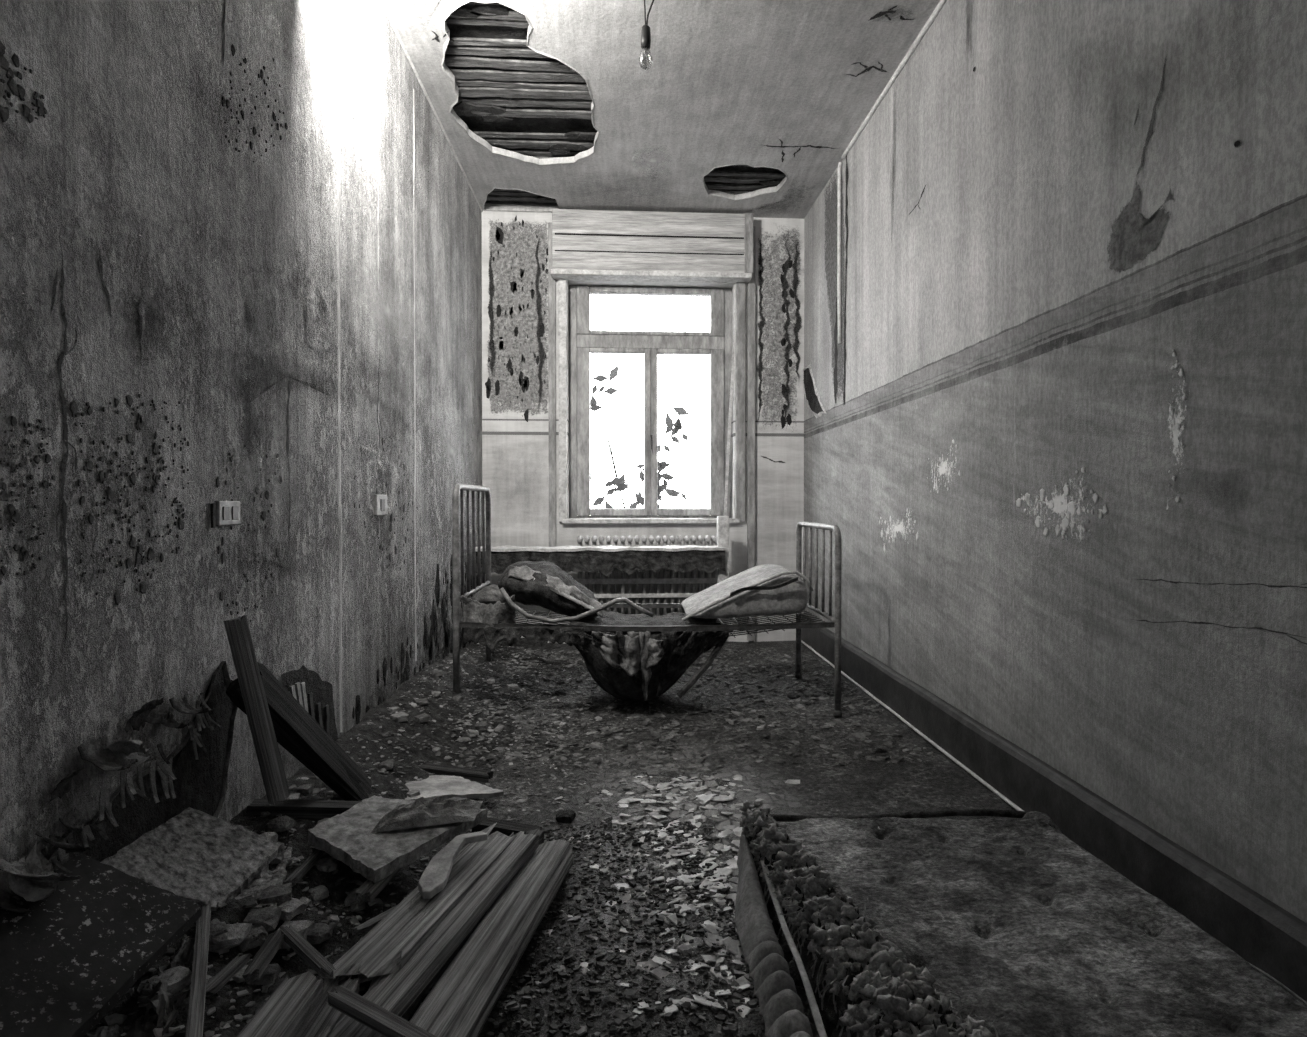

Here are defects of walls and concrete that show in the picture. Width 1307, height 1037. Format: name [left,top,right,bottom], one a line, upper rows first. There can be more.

peeling [485,215,548,422]
peeling [757,155,848,429]
crack [51,236,77,655]
peeling [1016,467,1108,540]
crack [1138,579,1307,588]
crack [1138,620,1307,645]